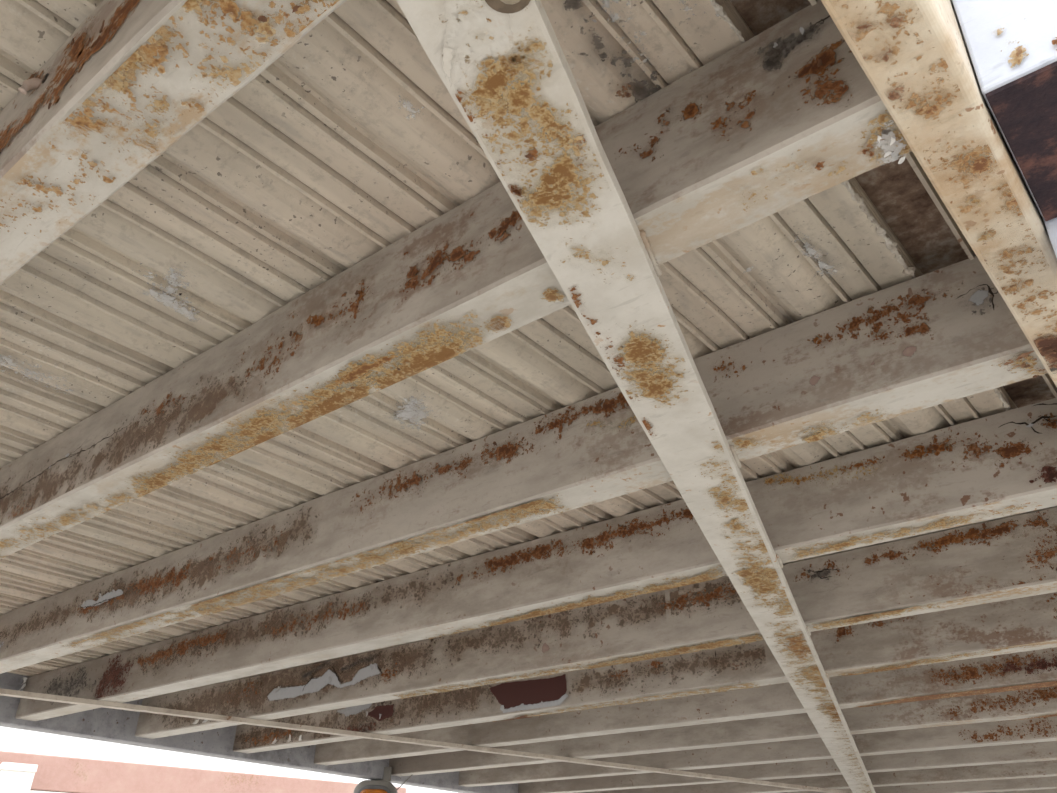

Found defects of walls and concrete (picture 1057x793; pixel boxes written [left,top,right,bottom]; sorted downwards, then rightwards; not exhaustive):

corrosion [0,0,141,152]
corrosion [0,150,116,236]
corrosion [397,1,633,305]
corrosion [788,0,1057,378]
crack [956,284,998,315]
corrosion [0,280,512,558]
corrosion [350,286,694,519]
crack [998,403,1057,434]
peeling [81,589,123,609]
peeling [267,655,382,701]
peeling [489,674,568,713]
corrosion [150,429,1057,793]